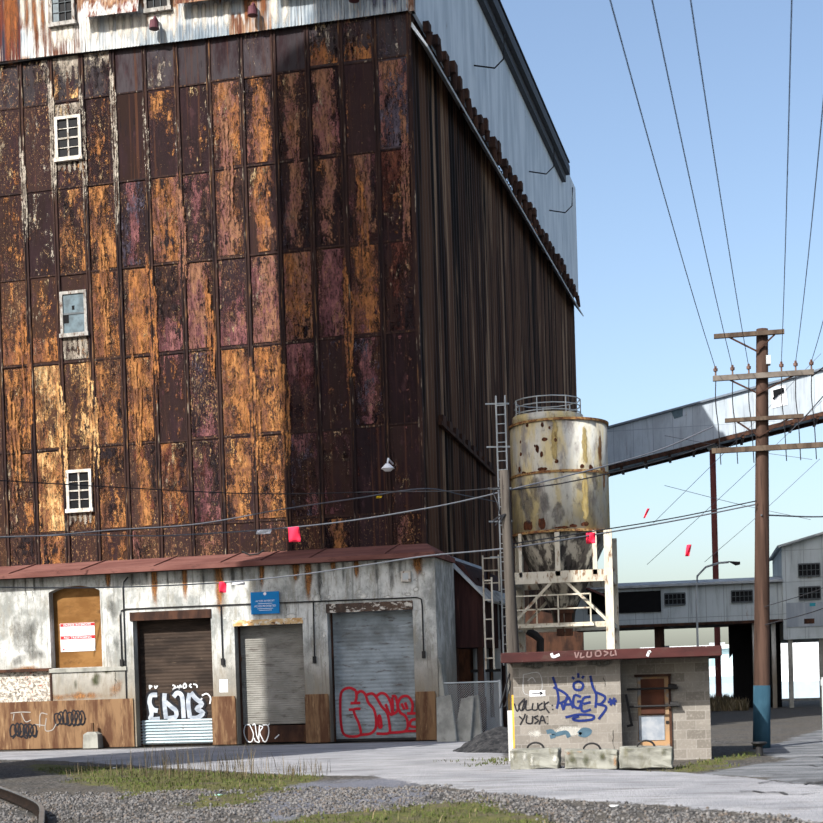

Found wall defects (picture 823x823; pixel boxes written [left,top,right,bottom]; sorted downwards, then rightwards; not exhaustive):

corrosion [4,0,45,48]
corrosion [398,98,412,288]
corrosion [7,312,33,502]
corrosion [56,369,68,497]
corrosion [86,363,100,482]
corrosion [98,227,110,371]
corrosion [130,251,159,465]
corrosion [204,275,216,380]
corrosion [342,162,371,419]
corrosion [534,416,558,463]
corrosion [523,427,605,530]
corrosion [214,569,223,609]